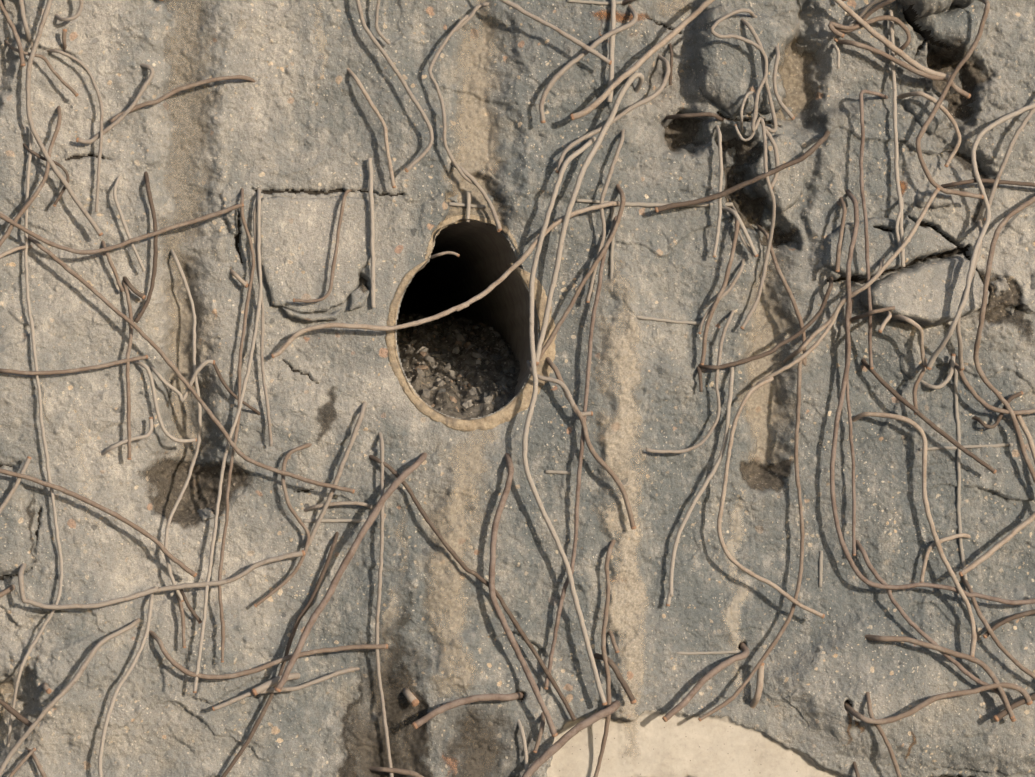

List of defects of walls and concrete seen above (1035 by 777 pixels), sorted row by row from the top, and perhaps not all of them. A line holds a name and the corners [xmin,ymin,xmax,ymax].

leakage [446,0,498,217]
crack [255,188,404,197]
crack [234,211,243,263]
crack [827,220,971,284]
crack [34,508,42,540]
leakage [597,266,647,753]
leakage [426,434,493,695]
leakage [338,602,433,777]
leakage [449,711,499,777]
peeling [547,710,843,777]